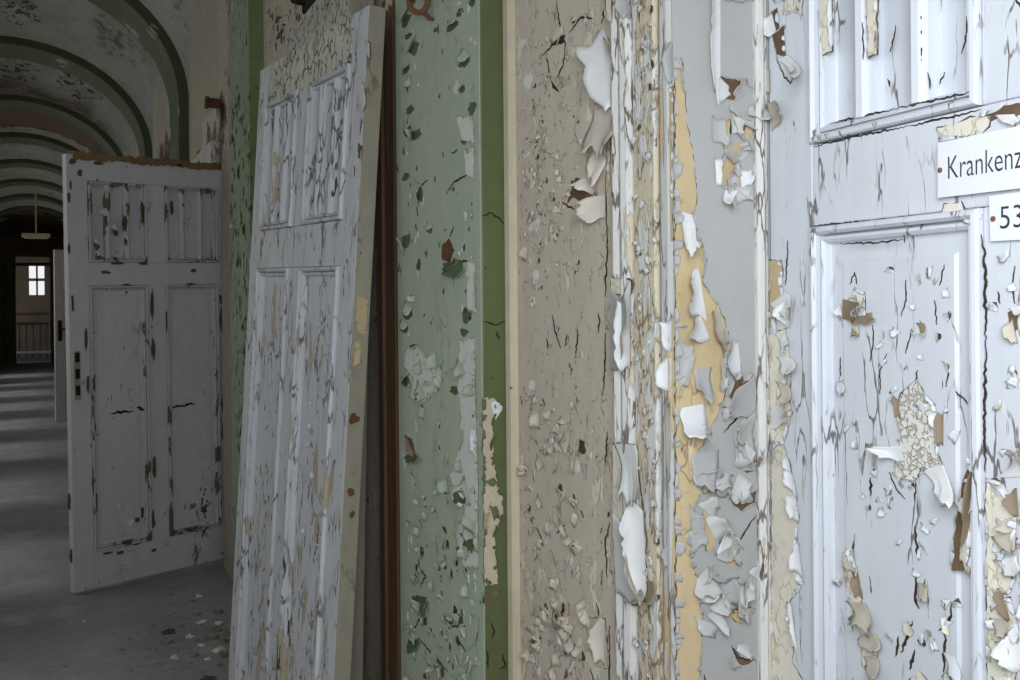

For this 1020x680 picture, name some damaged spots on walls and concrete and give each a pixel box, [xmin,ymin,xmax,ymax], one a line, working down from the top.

peeling [267,0,300,50]
peeling [818,0,834,56]
peeling [936,128,960,142]
peeling [980,104,1020,126]
peeling [201,84,253,239]
peeling [150,288,168,332]
peeling [517,0,804,680]